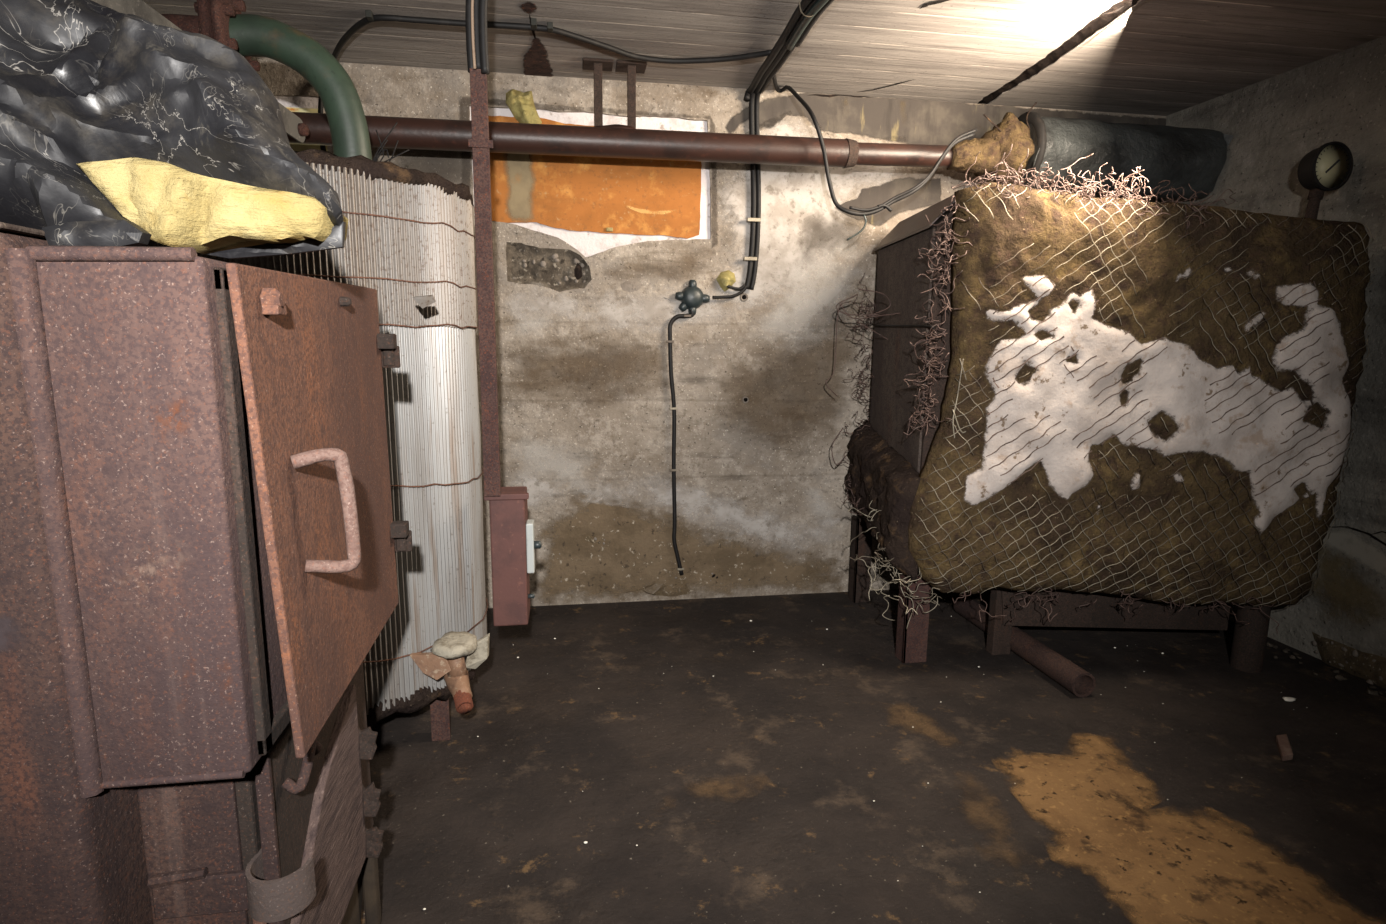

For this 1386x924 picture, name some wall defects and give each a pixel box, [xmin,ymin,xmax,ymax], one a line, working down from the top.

crack [977,0,1151,104]
water stain [522,478,552,503]
water stain [649,487,790,538]
crack [1329,526,1386,546]